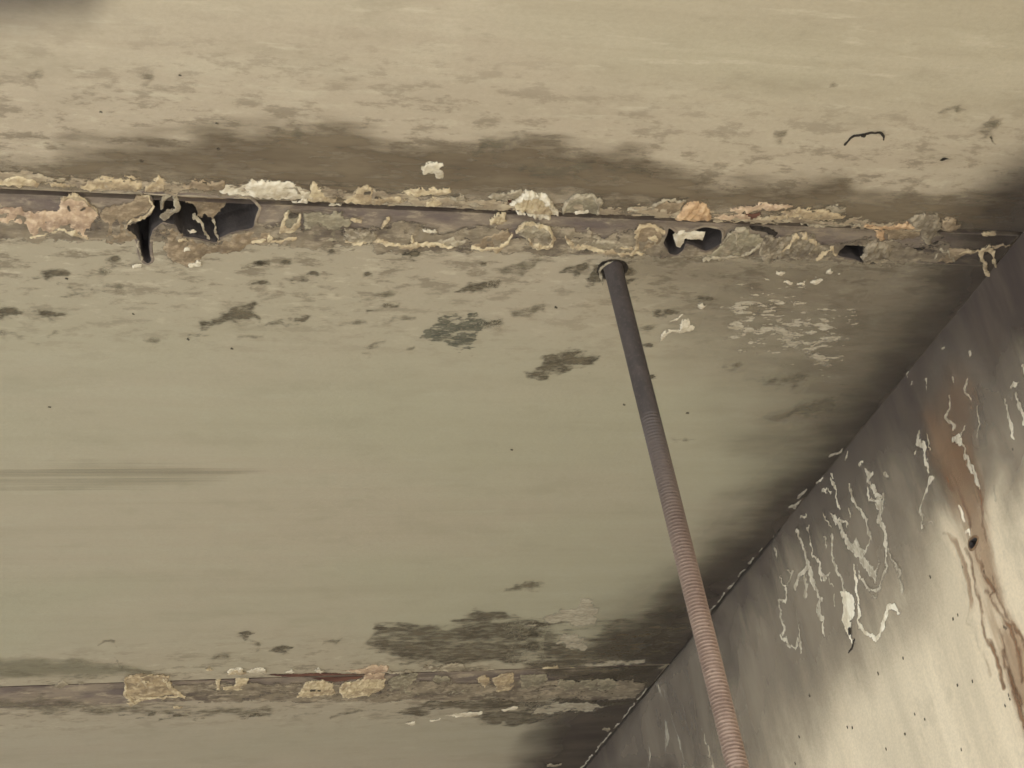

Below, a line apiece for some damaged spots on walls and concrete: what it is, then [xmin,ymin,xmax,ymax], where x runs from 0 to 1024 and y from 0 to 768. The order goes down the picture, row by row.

peeling [421,161,444,179]
hole [126,191,262,265]
hole [663,225,725,257]
hole [837,242,865,263]
leakage [0,169,1024,768]
hole [958,505,979,551]
rust [969,555,1024,728]